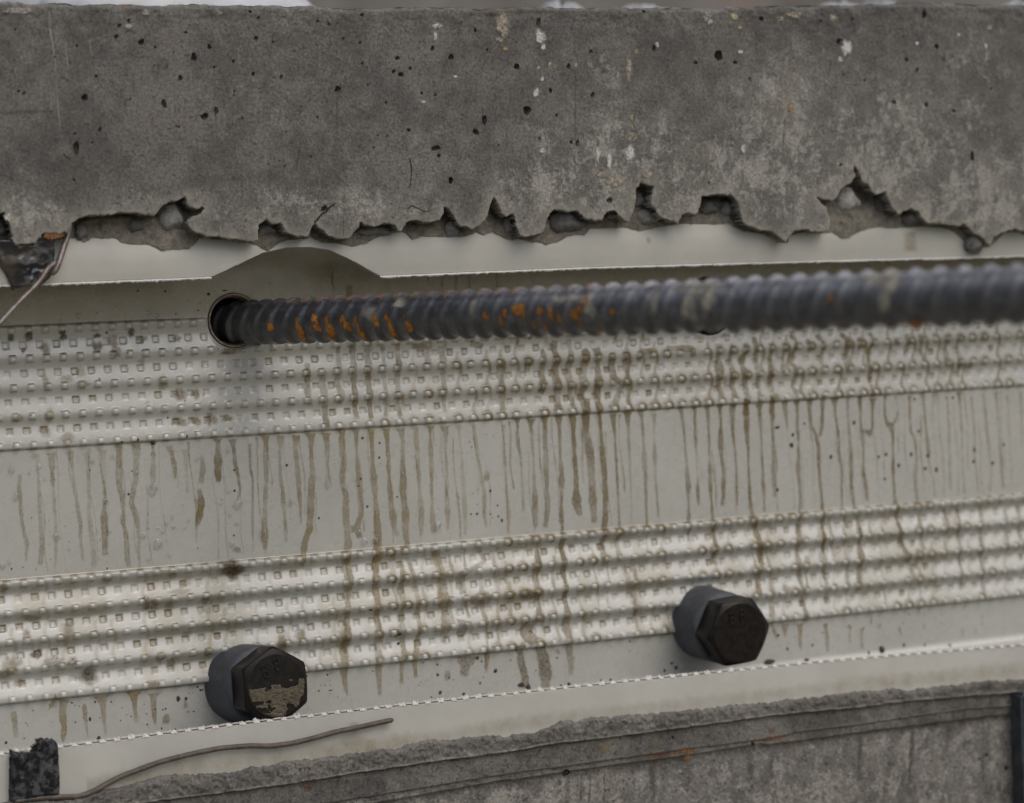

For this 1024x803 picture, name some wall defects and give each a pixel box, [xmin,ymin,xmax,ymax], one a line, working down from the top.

spalling [0,212,11,239]
spalling [42,198,226,250]
spalling [244,184,806,251]
spalling [819,178,1024,255]
corrosion [295,314,423,351]
corrosion [196,496,205,521]
corrosion [214,457,239,481]
corrosion [293,372,409,627]
corrosion [515,344,639,648]
corrosion [686,337,839,595]
corrosion [224,560,244,579]
corrosion [515,614,558,687]